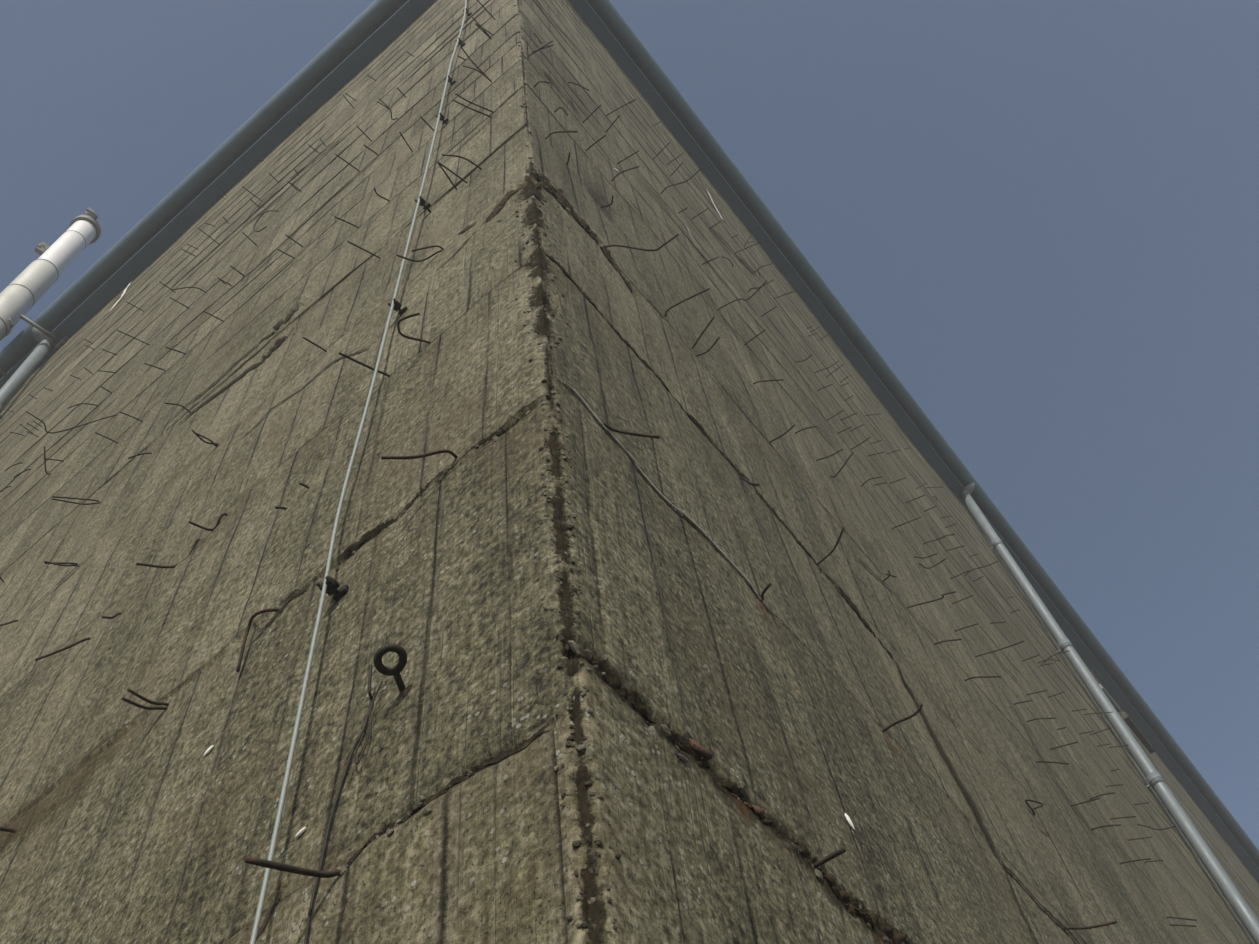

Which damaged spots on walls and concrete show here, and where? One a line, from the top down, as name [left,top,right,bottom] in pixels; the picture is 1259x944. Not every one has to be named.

crack [233,348,370,444]
crack [335,411,530,571]
crack [545,253,985,755]
crack [259,587,306,630]